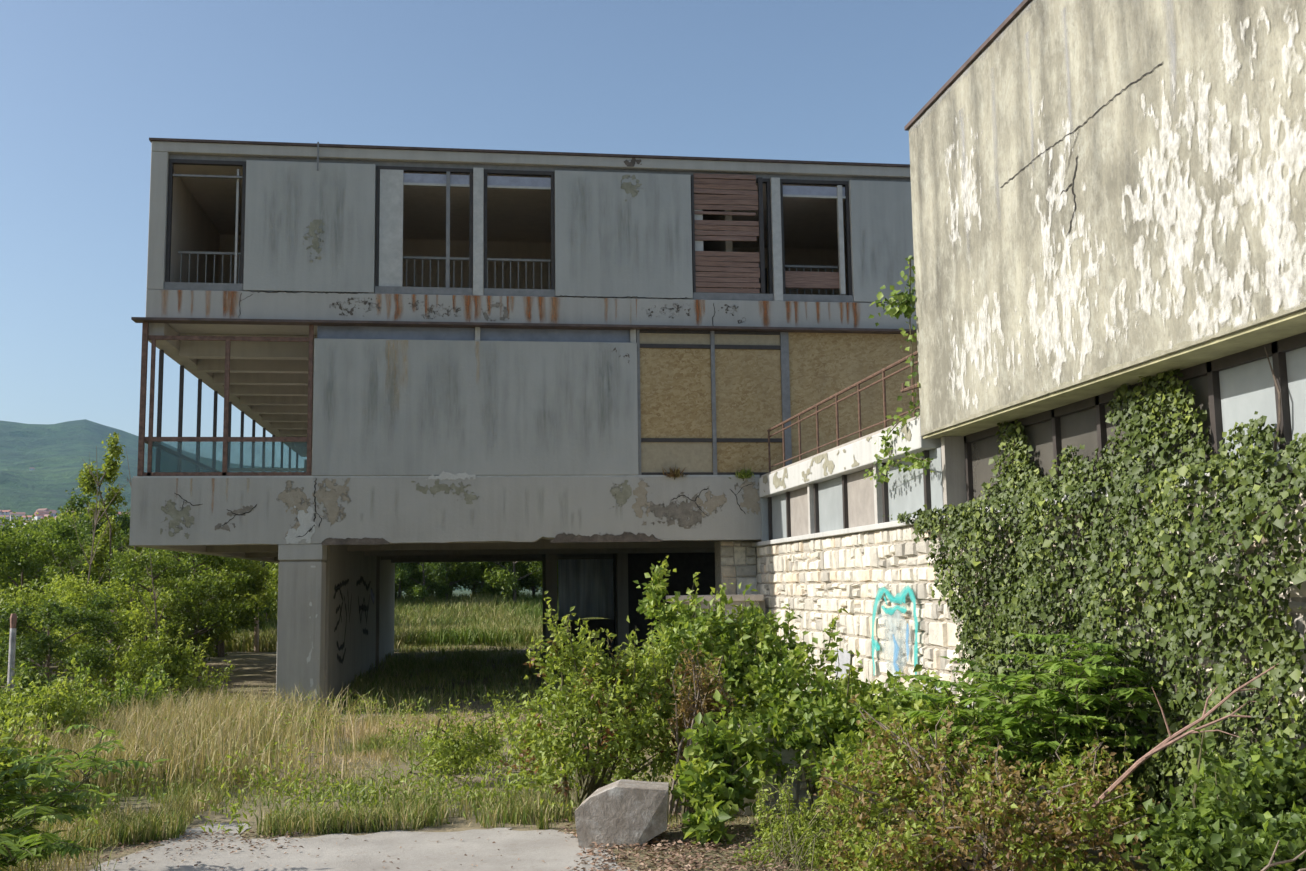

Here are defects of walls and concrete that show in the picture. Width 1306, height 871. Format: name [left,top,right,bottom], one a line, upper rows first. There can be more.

crack [1000,62,1163,237]
rust [453,295,490,316]
rust [507,296,556,320]
water stain [924,302,1306,435]
peeling [901,424,911,441]
peeling [160,499,194,539]
peeling [215,505,253,531]
peeling [278,478,390,545]
peeling [411,471,479,504]
peeling [550,449,859,543]